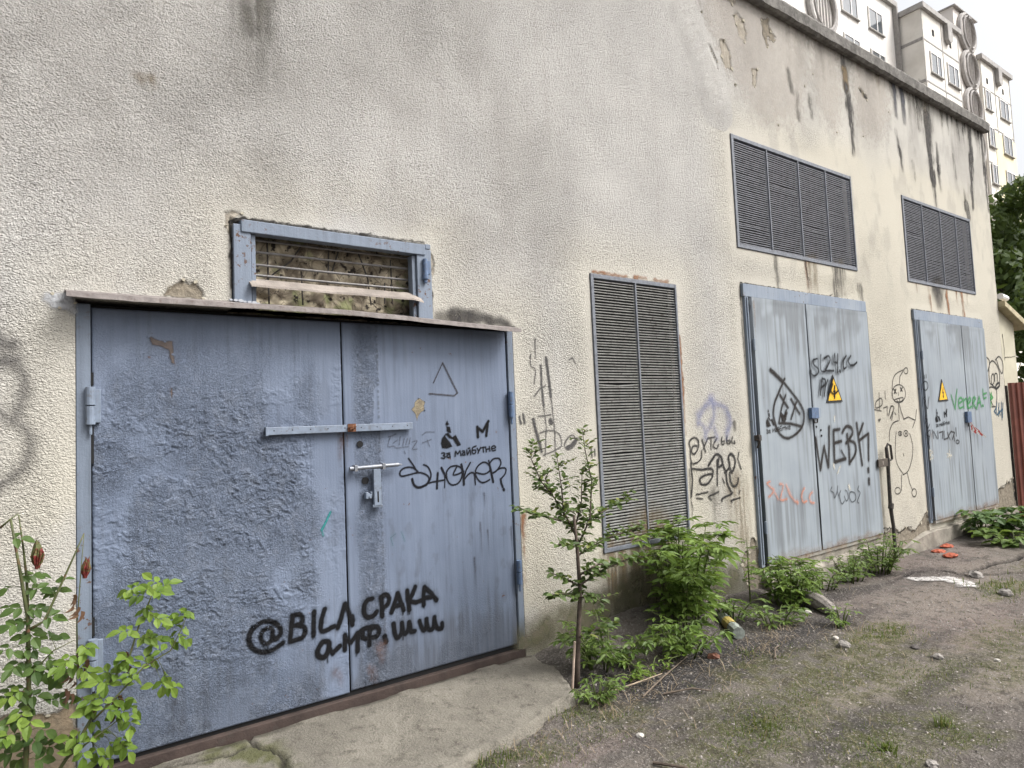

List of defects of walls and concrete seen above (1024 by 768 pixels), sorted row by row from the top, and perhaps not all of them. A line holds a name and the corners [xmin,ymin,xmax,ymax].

spalling [761,18,776,48]
spalling [710,39,737,86]
leakage [840,54,855,153]
leakage [890,82,940,206]
leakage [946,114,989,219]
spalling [164,278,205,300]
leakage [833,259,845,297]
leakage [933,279,942,303]
peeling [147,335,175,364]